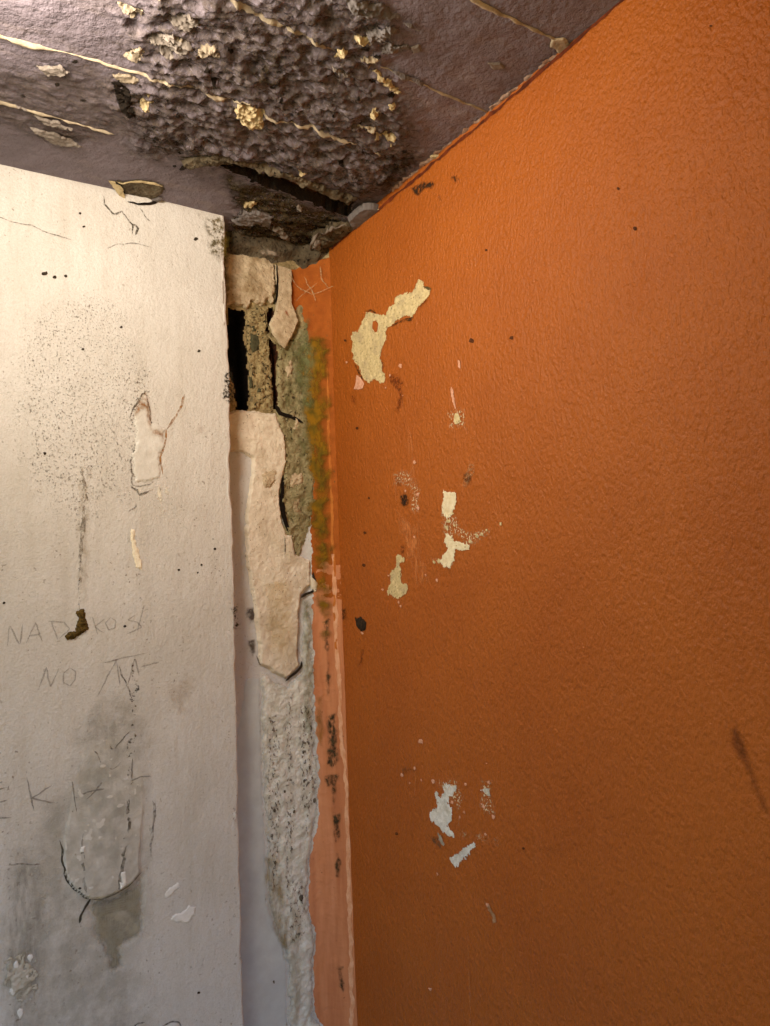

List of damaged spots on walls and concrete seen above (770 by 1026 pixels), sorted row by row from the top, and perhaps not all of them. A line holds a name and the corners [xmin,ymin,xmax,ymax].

spalling [0,0,557,251]
leakage [194,218,227,255]
peeling [346,279,431,409]
flaking render [225,253,318,681]
peeling [433,490,487,568]
peeling [381,554,408,607]
peeling [400,766,487,868]